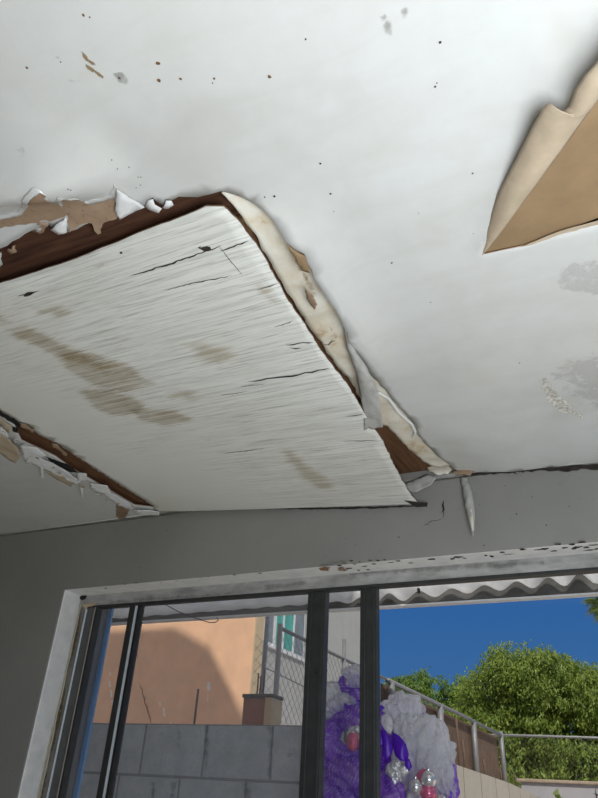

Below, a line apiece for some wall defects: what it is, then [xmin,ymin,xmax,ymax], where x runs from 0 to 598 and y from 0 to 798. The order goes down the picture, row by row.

peeling [483,60,598,254]
peeling [0,184,173,235]
crack [134,241,248,290]
crack [224,368,328,395]
peeling [20,445,160,516]